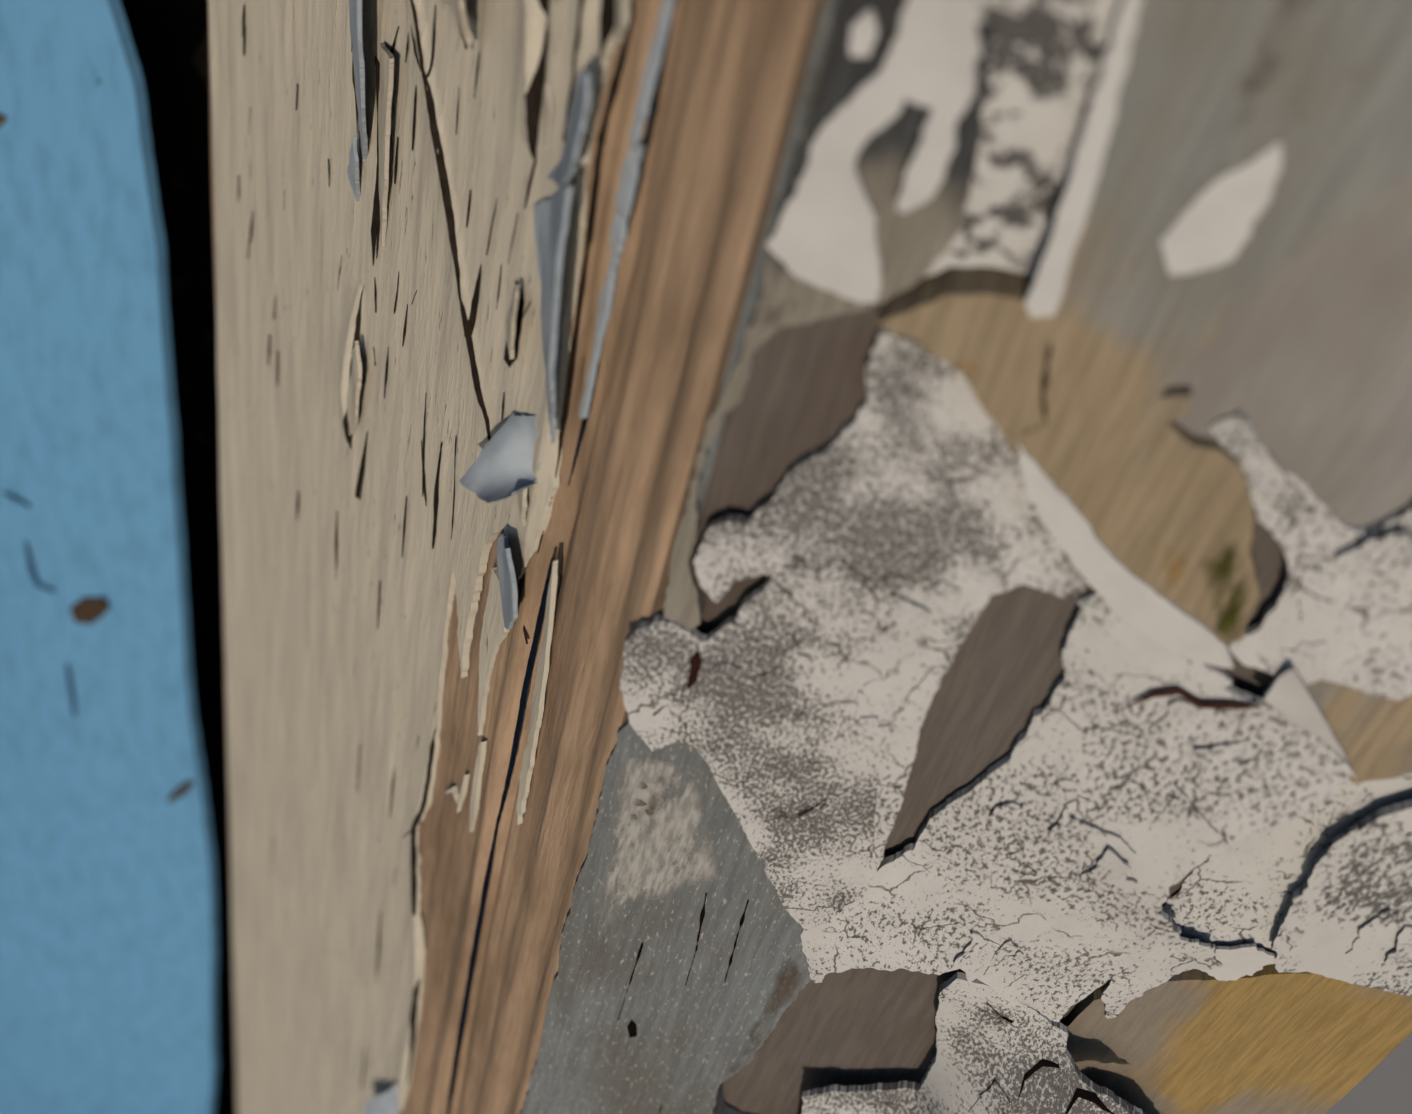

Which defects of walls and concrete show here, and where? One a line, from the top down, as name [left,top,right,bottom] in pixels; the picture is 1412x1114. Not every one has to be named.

crack [343,0,490,500]
peeling [765,0,1142,319]
peeling [1160,140,1282,276]
crack [2,492,55,593]
crack [66,664,76,717]
peeling [607,327,1412,1114]
peeling [364,1083,399,1114]